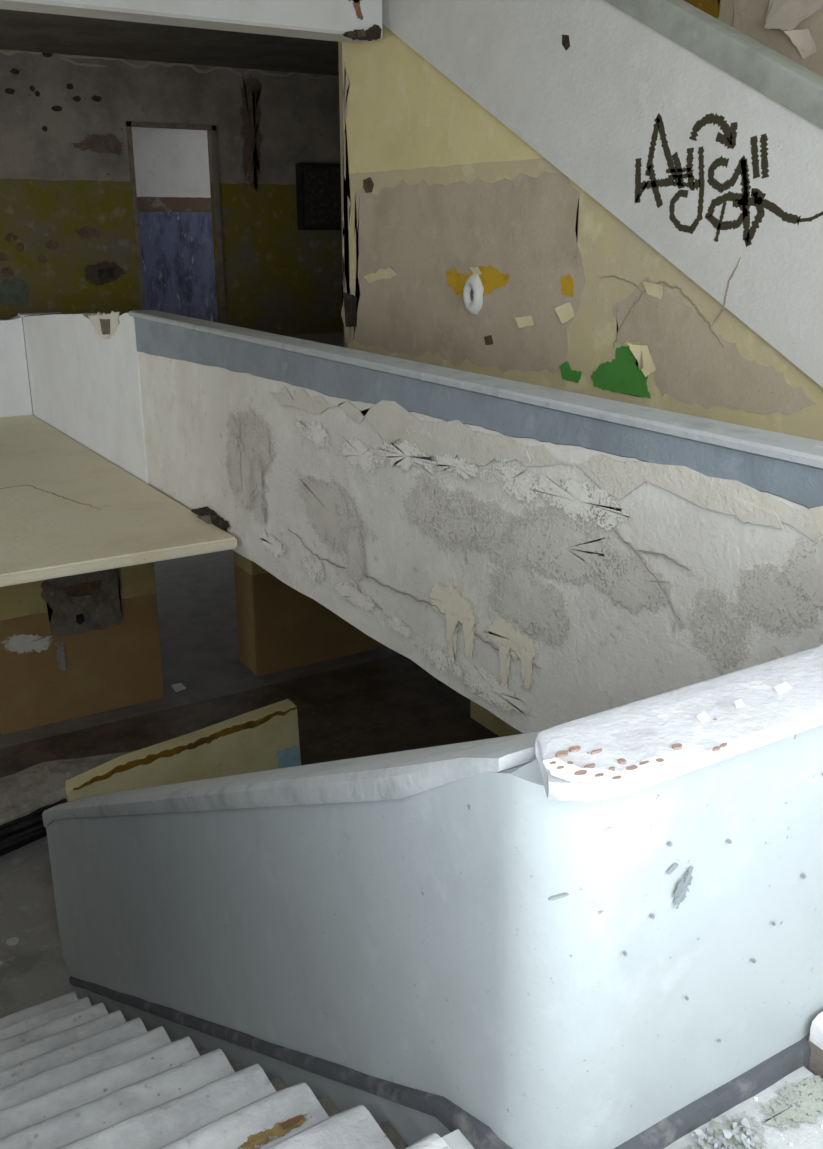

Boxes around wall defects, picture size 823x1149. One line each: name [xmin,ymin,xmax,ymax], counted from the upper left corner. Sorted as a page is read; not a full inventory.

corrosion [349,0,363,20]
peeling [684,0,823,75]
corrosion [240,73,263,192]
peeling [341,64,816,416]
flaking render [269,386,823,543]
flaking render [40,568,123,637]
crack [288,529,541,669]
crack [591,507,690,620]
spalling [543,743,682,785]